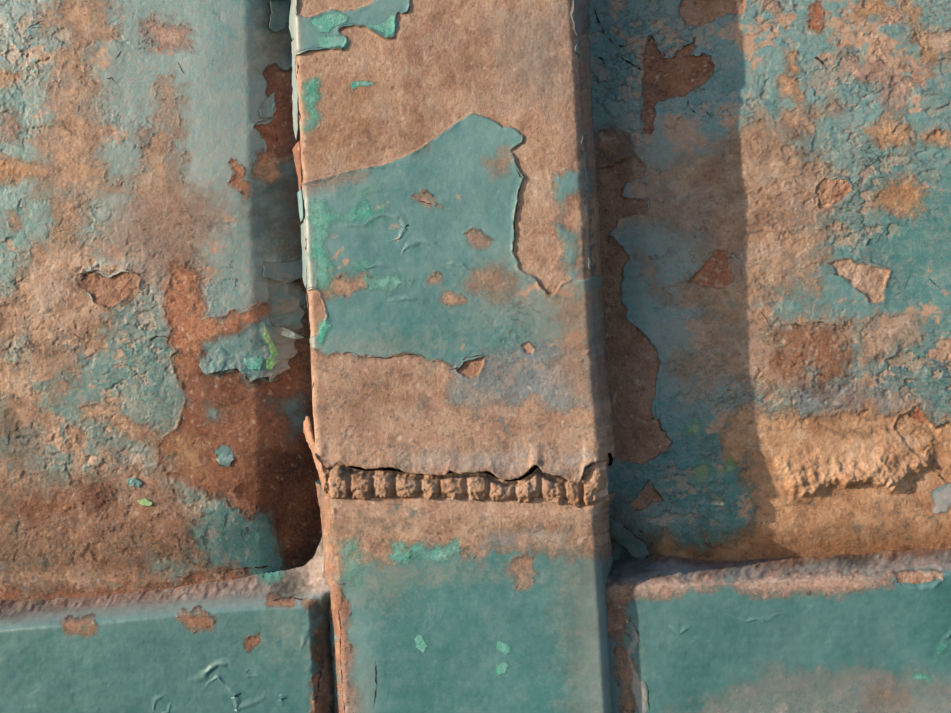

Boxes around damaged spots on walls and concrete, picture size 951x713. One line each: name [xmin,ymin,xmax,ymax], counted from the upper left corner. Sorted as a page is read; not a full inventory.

peeling [680,0,746,27]
peeling [639,36,714,134]
corrosion [632,50,921,396]
peeling [199,0,671,501]
peeling [76,268,140,307]
peeling [830,259,890,303]
corrosion [0,0,616,713]
crack [315,453,454,486]
crack [478,465,562,482]
crack [587,452,613,469]
corrosion [606,392,951,713]
peeling [896,570,943,585]